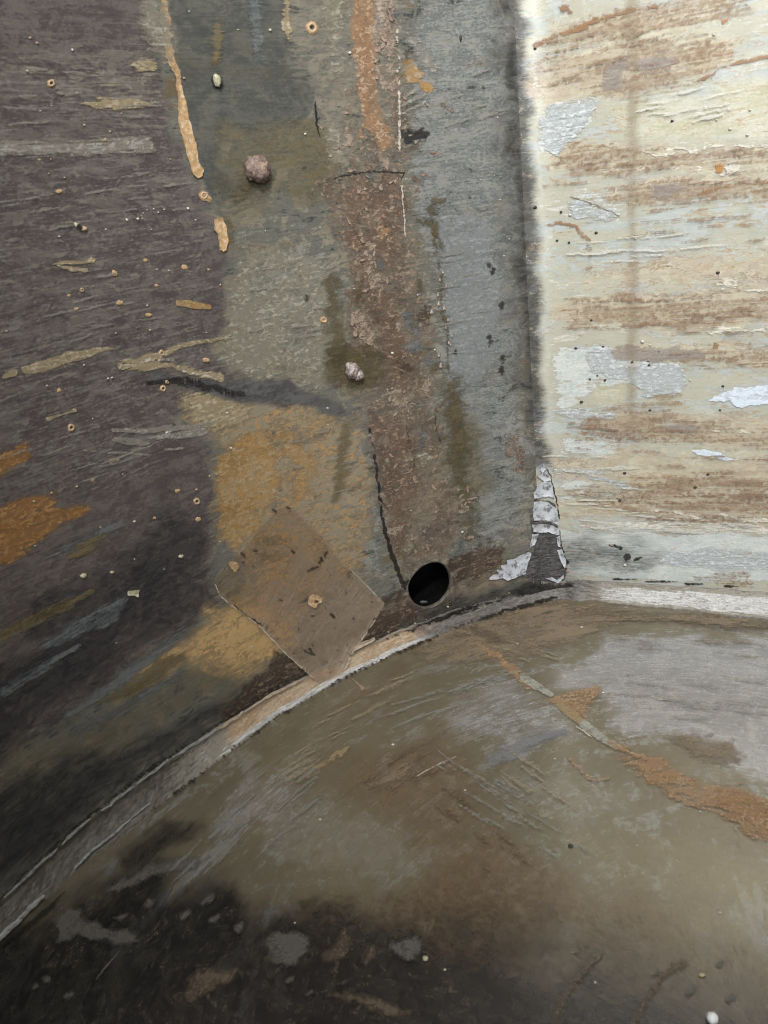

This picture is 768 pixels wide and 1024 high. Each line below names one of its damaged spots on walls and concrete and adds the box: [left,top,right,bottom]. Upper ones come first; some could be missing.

corrosion [139,0,204,178]
crack [334,29,406,237]
corrosion [214,217,234,252]
corrosion [312,0,465,579]
corrosion [0,493,90,565]
crack [368,428,409,591]
peeling [489,464,569,583]
corrosion [475,641,768,841]